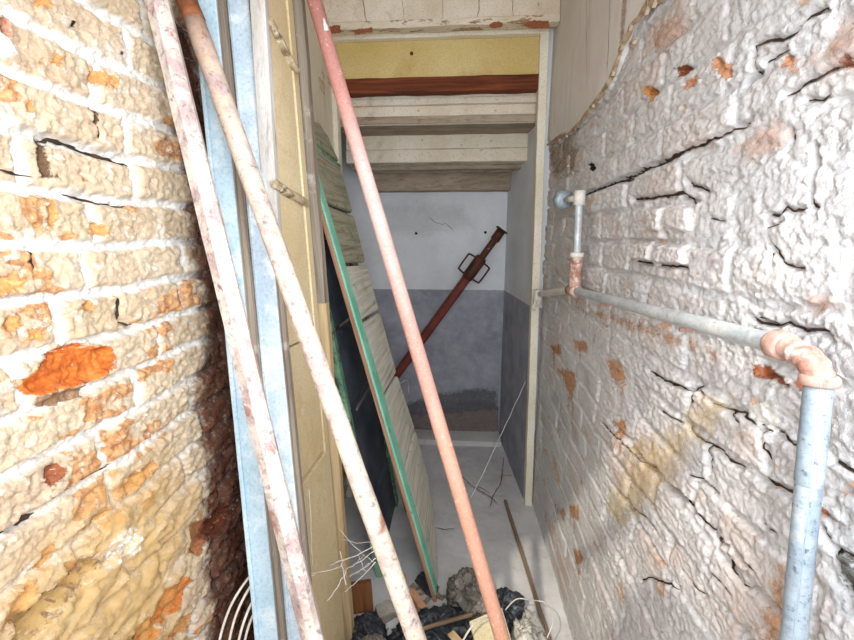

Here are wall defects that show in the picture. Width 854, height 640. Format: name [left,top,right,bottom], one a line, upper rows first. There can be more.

damp [175,22,207,151]
peeling [523,20,550,29]
spalling [709,52,733,83]
crack [34,127,128,167]
crack [586,123,751,221]
crack [768,200,820,269]
spalling [1,313,116,407]
damp [185,201,255,640]
crack [651,371,797,494]
damp [101,526,144,568]
crack [643,411,754,595]
spalling [133,577,195,640]